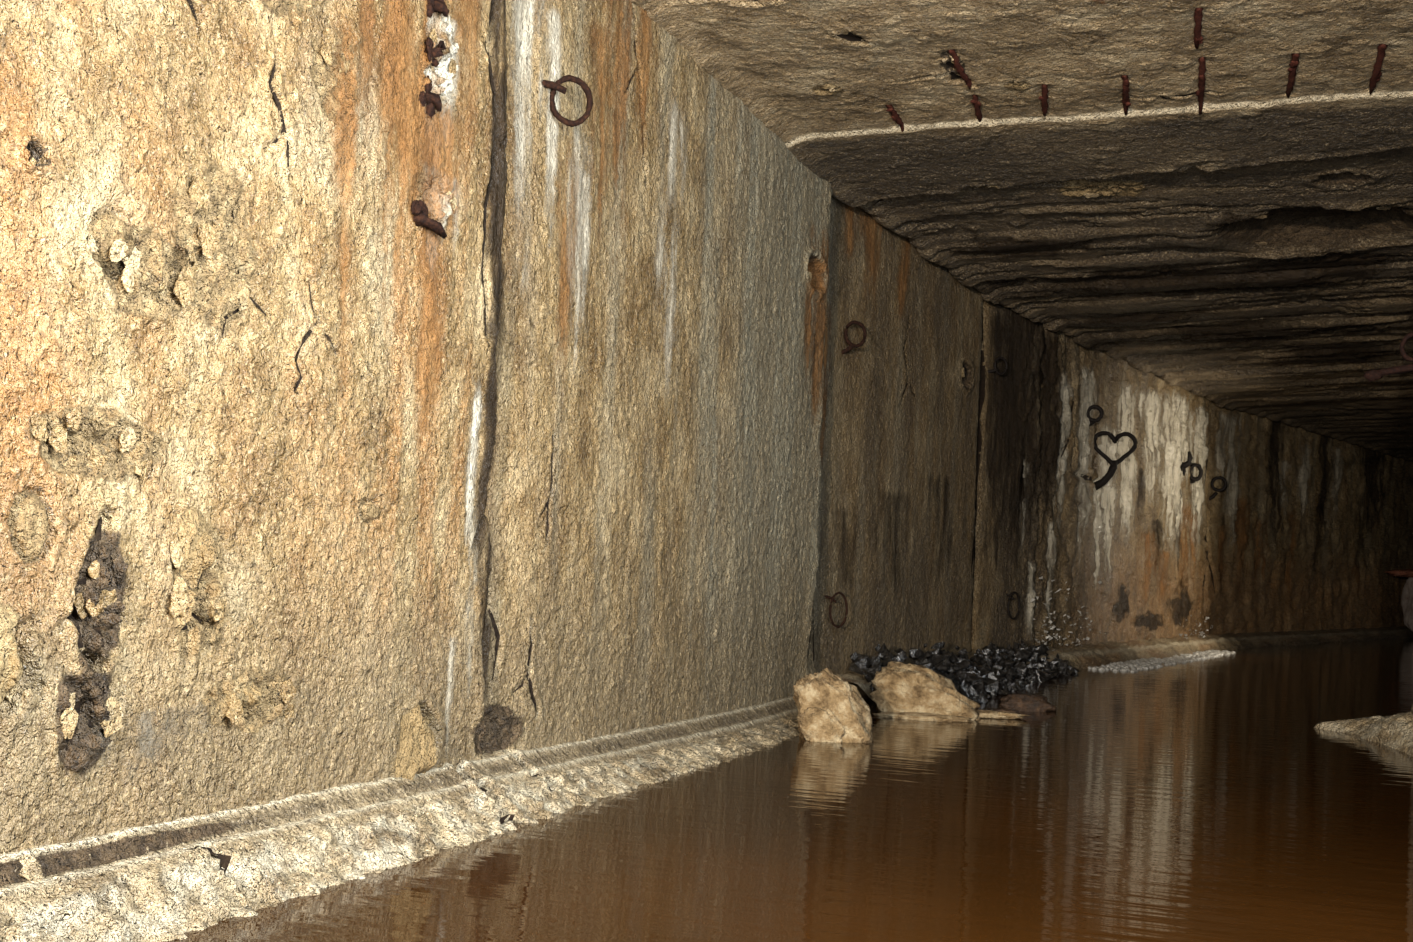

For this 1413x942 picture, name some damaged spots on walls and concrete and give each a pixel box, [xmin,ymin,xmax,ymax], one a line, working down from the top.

spalling [419,13,457,113]
corrosion [1194,7,1206,115]
corrosion [1286,53,1300,98]
corrosion [1369,44,1388,94]
corrosion [334,0,457,429]
water stain [960,235,1093,258]
water stain [985,253,1394,630]
spalling [7,490,49,563]
spalling [57,531,128,776]